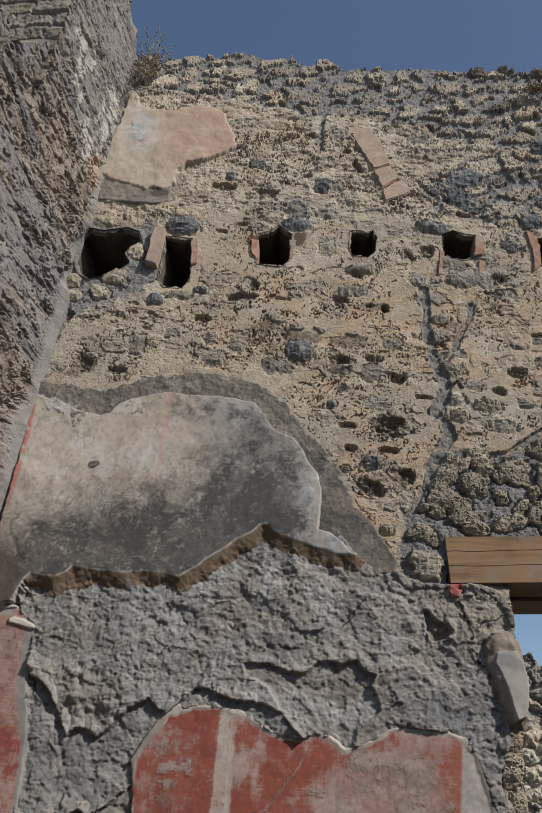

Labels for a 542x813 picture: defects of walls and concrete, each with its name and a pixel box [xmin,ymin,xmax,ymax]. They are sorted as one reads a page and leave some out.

spalling [373,413,410,437]
spalling [350,477,382,497]
spalling [392,464,419,486]
crack [150,634,195,657]
crack [339,595,366,628]
spalling [422,604,457,641]
crack [458,595,512,671]
spalling [17,656,194,813]
spalling [181,652,459,813]
crack [258,748,311,813]